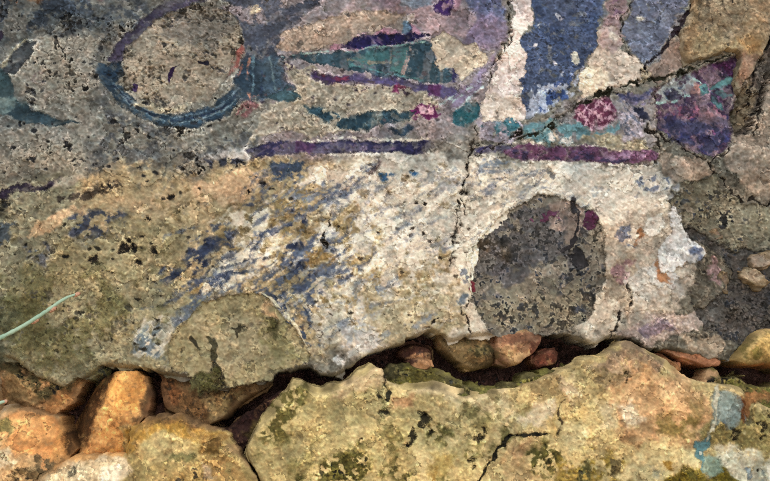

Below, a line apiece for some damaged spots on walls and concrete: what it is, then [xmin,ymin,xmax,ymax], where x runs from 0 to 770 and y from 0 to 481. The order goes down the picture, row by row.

crack [449,0,733,264]
crack [644,123,770,207]
crack [736,36,770,136]
crack [478,399,565,481]